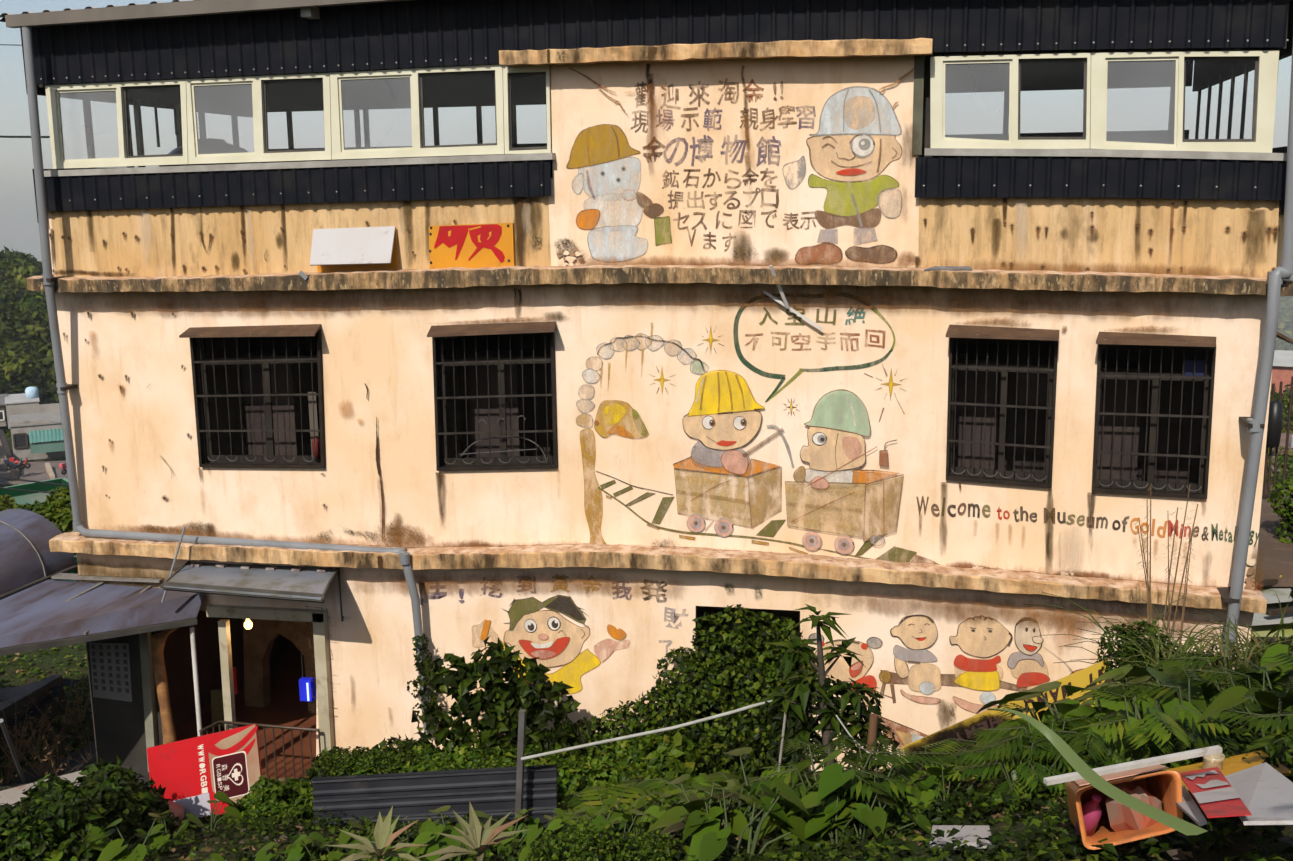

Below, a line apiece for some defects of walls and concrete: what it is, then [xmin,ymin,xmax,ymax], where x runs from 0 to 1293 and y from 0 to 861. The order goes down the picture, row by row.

crack [568,67,628,115]
leakage [87,210,105,247]
leakage [170,208,185,274]
leakage [403,200,429,257]
leakage [993,198,1048,253]
leakage [1135,200,1152,254]
leakage [1170,201,1187,250]
leakage [1243,209,1277,255]
crack [365,384,384,568]
leakage [364,518,424,548]